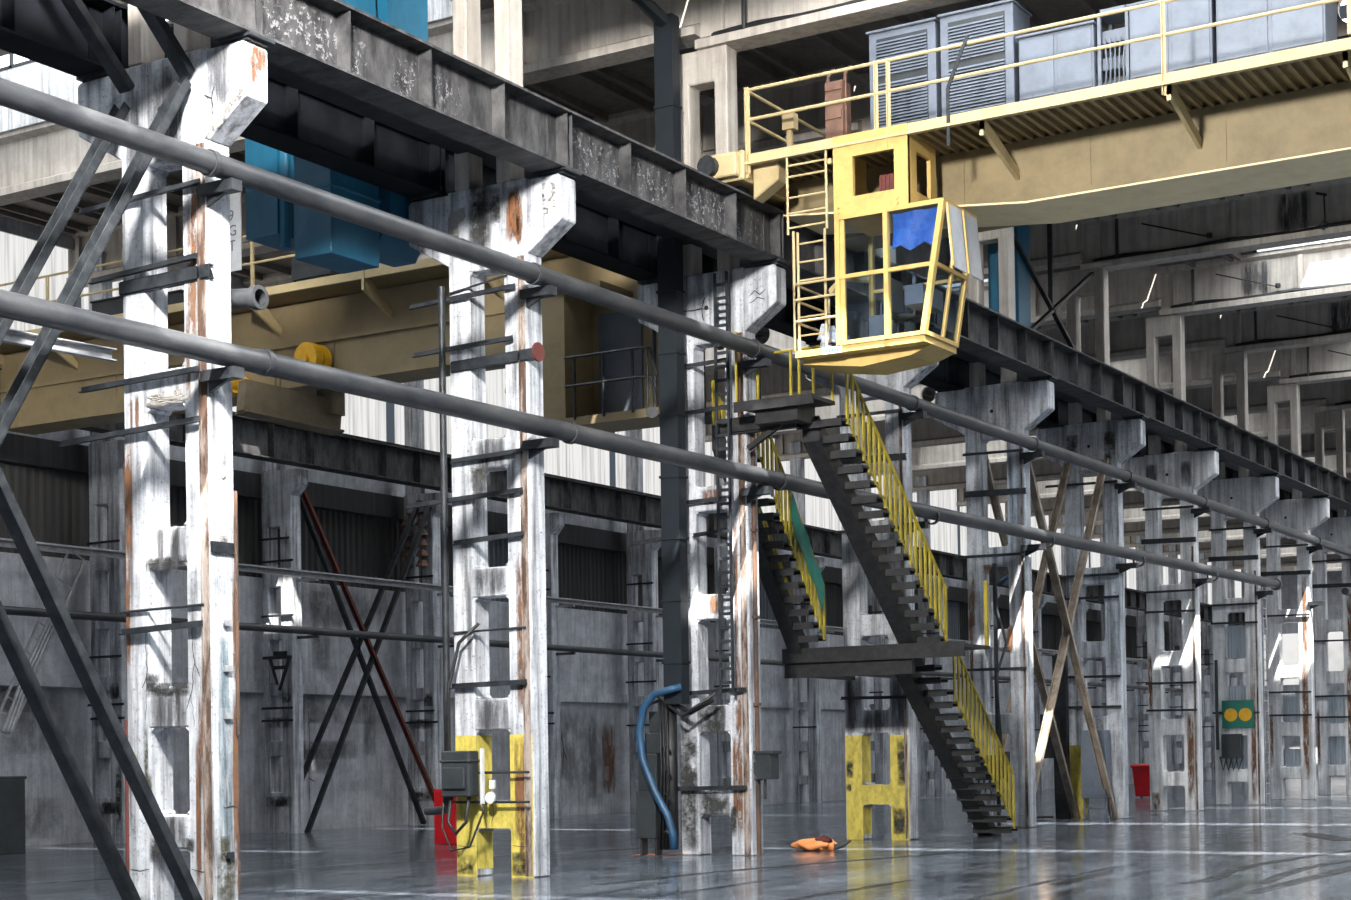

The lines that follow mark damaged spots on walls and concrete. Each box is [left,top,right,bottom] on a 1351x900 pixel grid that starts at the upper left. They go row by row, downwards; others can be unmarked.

corrosion [248,46,266,83]
corrosion [506,188,522,244]
corrosion [602,728,615,792]